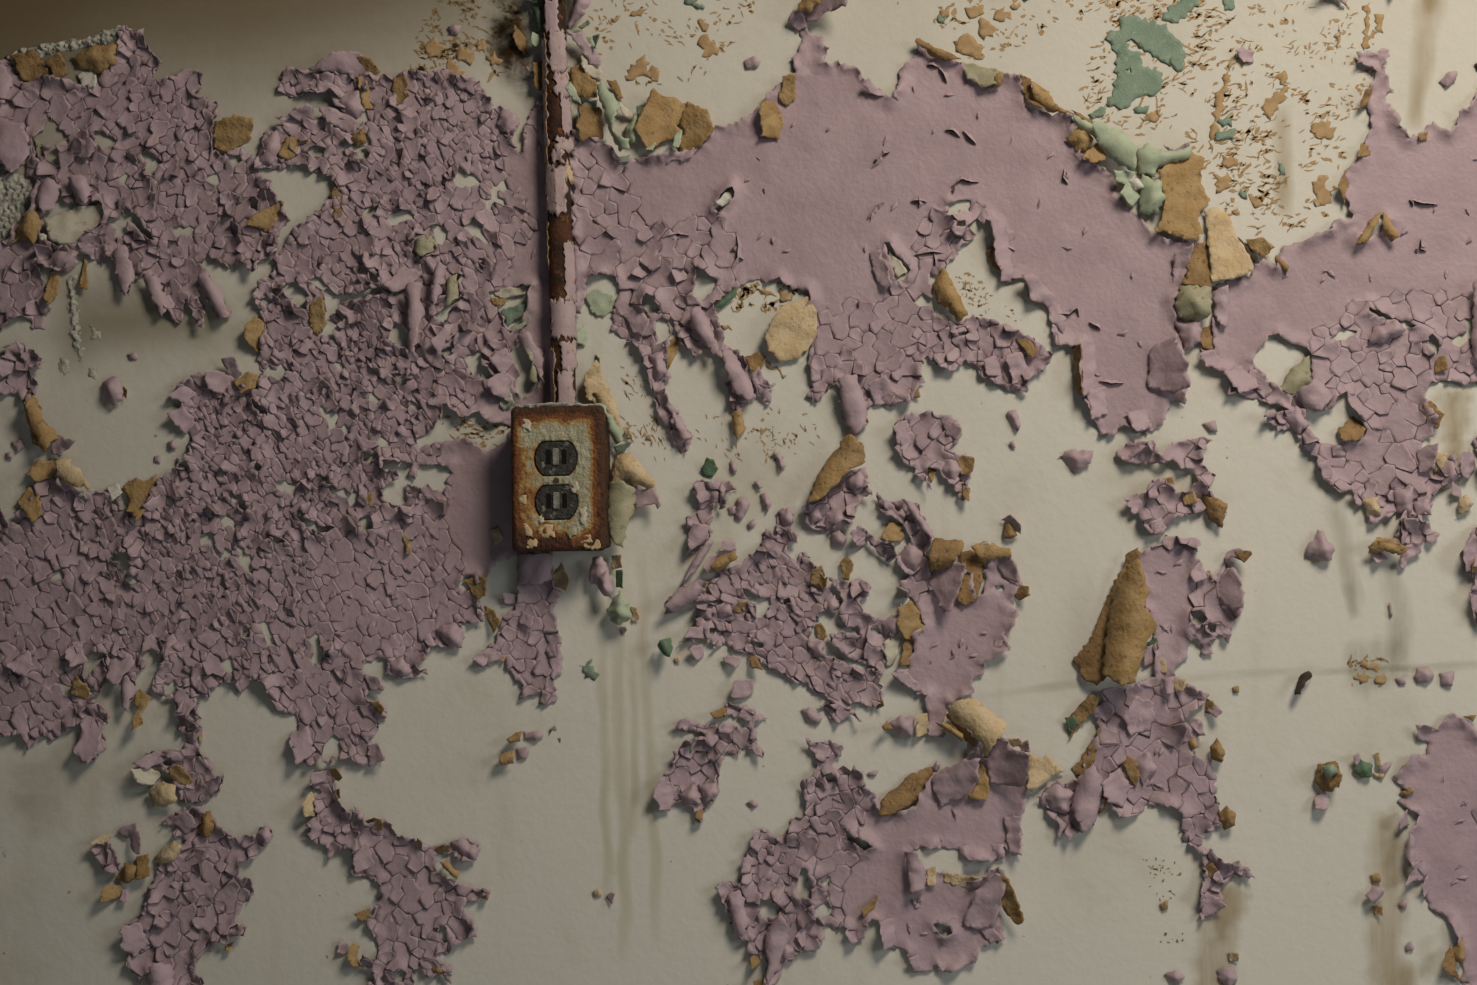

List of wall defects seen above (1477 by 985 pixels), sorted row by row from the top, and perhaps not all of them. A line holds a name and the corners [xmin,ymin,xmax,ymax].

peeling [549,0,1477,569]
peeling [0,0,638,808]
peeling [583,354,661,634]
peeling [653,436,1255,985]
peeling [1294,671,1312,695]
peeling [1396,666,1455,686]
peeling [1460,527,1477,624]
peeling [87,823,150,903]
peeling [119,806,273,985]
peeling [301,768,491,985]
peeling [1314,713,1477,985]